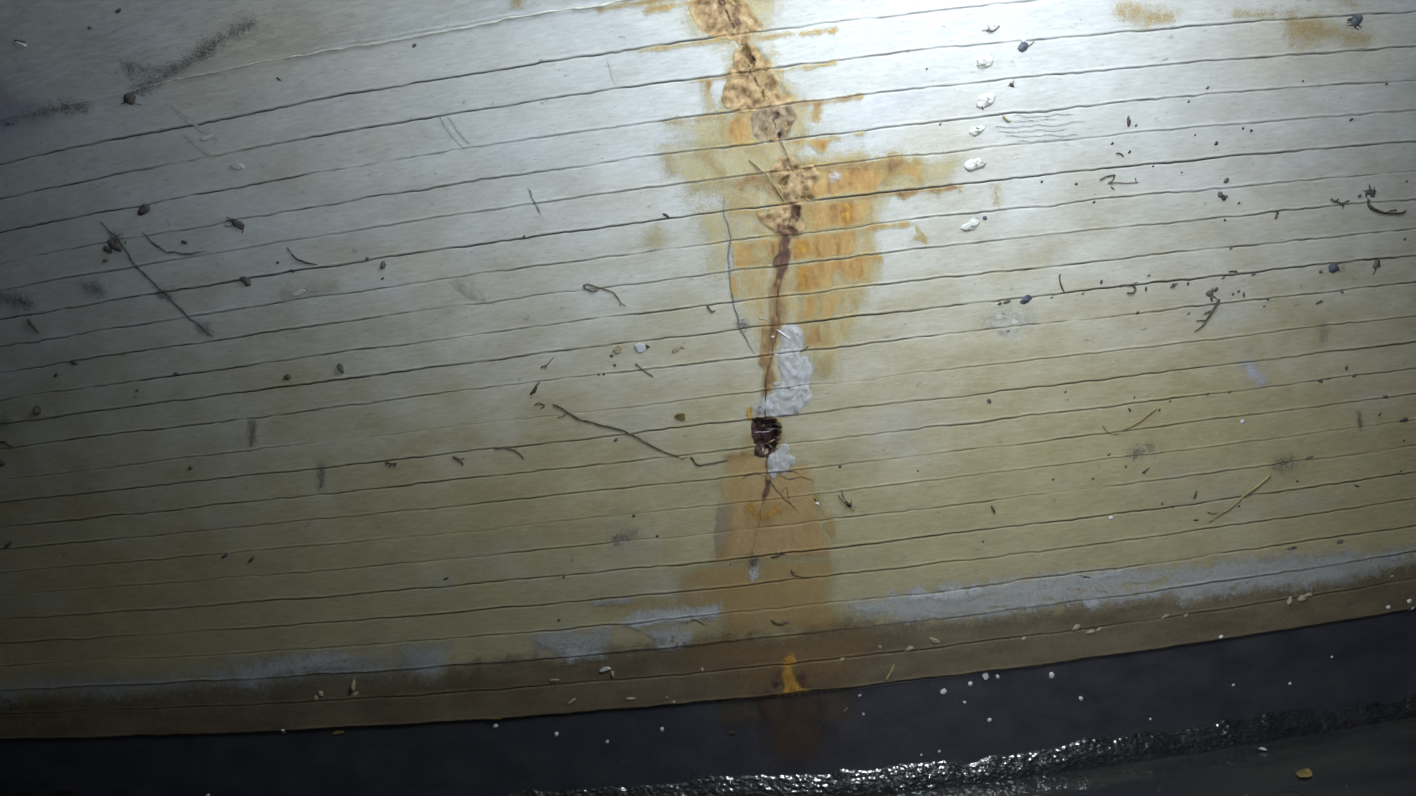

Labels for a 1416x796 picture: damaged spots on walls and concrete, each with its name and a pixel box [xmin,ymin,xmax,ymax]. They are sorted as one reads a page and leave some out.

rust [595,0,965,383]
crack [723,5,807,555]
leakage [753,318,815,418]
spalling [739,406,788,459]
rust [708,450,840,569]
leakage [767,441,796,479]
leakage [0,544,1416,767]